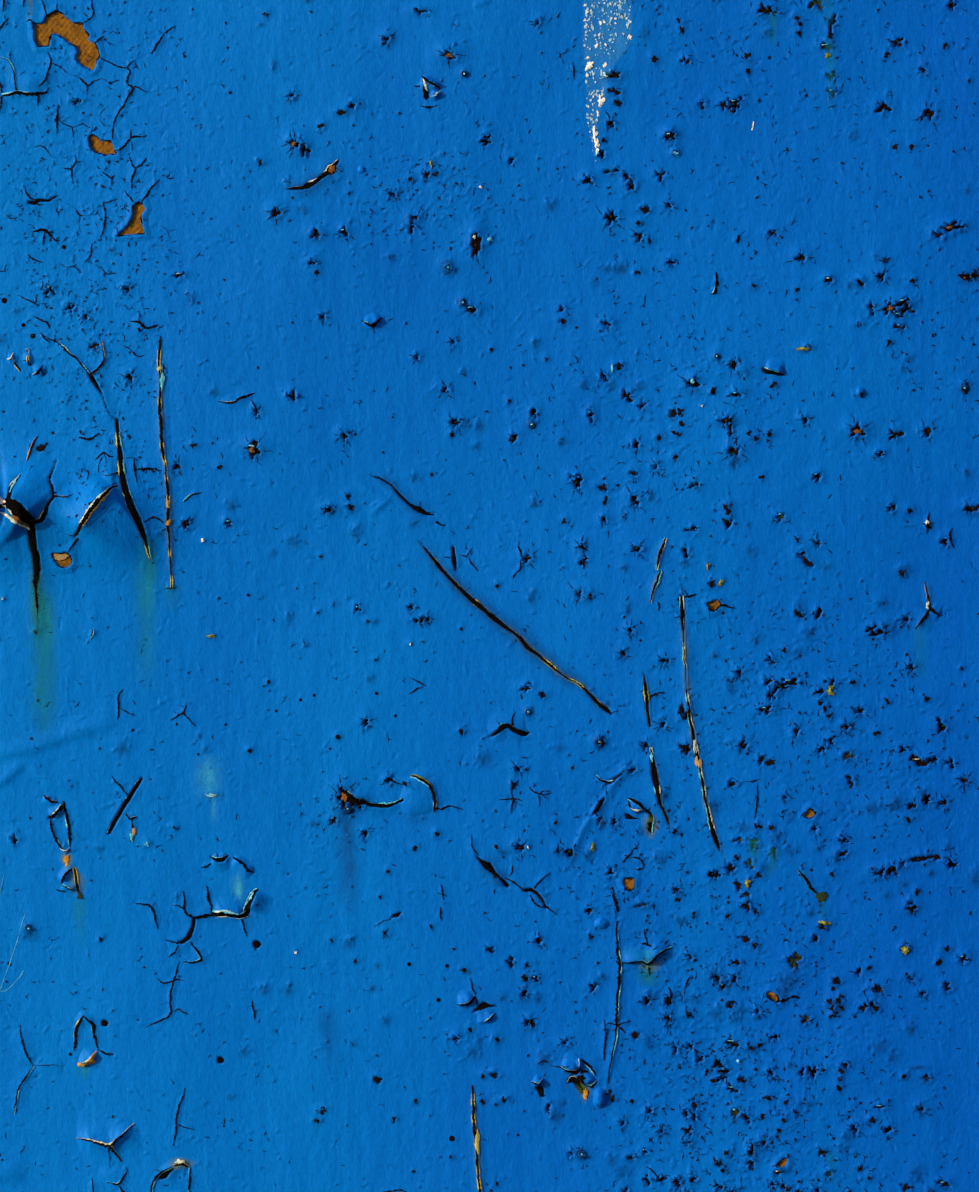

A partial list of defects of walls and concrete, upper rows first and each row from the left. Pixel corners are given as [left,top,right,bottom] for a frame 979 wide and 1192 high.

peeling [26,0,107,77]
rust [712,1,921,82]
rust [0,1,195,518]
peeling [112,194,152,243]
crack [206,77,532,267]
crack [644,0,967,256]
rust [509,278,804,545]
crack [106,776,172,861]
rust [553,525,968,1192]
crack [135,891,222,1058]
peeling [147,1156,196,1192]
crack [76,1079,290,1192]